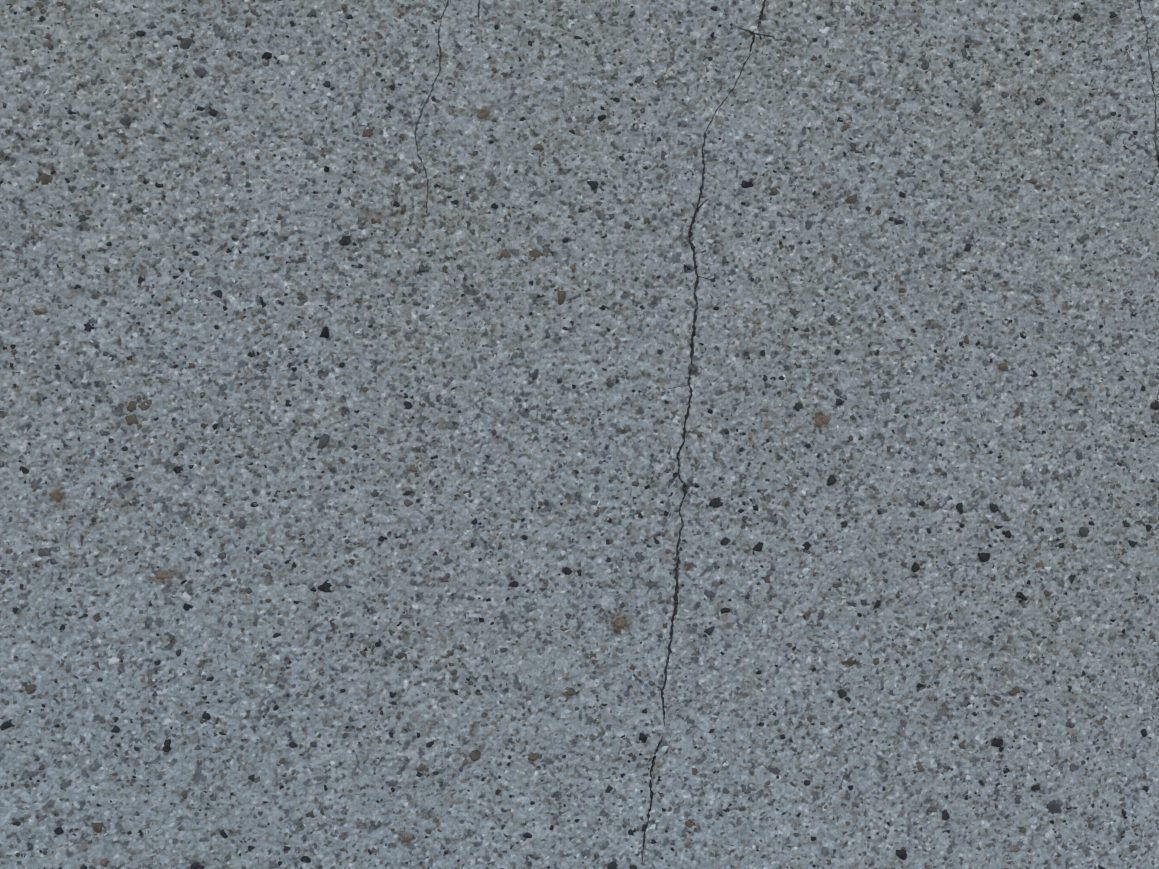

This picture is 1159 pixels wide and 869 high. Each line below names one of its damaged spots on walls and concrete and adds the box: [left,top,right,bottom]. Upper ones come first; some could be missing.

crack [631,0,791,866]